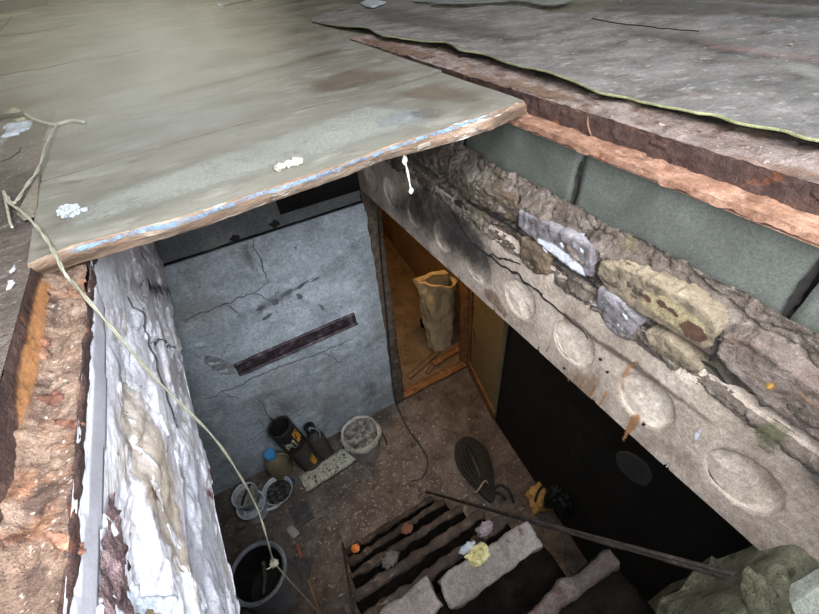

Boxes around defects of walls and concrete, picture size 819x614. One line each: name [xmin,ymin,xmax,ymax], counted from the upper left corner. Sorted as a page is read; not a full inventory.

crack [592,18,699,32]
crack [185,239,271,323]
crack [127,296,179,428]
crack [205,339,353,441]
peeling [118,379,194,584]
spalling [97,492,178,614]